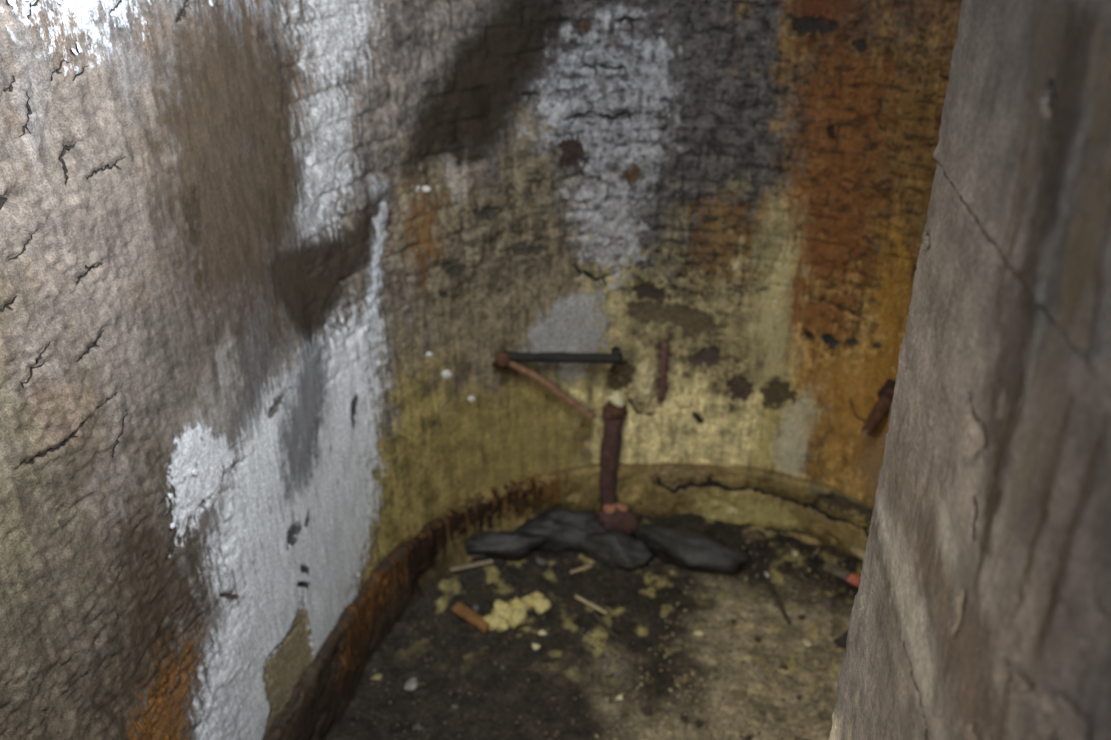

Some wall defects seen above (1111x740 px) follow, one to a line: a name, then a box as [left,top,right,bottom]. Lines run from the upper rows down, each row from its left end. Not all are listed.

crack [4,59,89,137]
crack [58,142,125,185]
crack [0,197,8,210]
crack [7,229,38,261]
damp [153,0,387,499]
crack [75,262,103,291]
crack [937,161,1111,396]
crack [0,295,17,311]
rust [603,503,629,514]
crack [648,476,869,540]
crack [903,641,928,740]